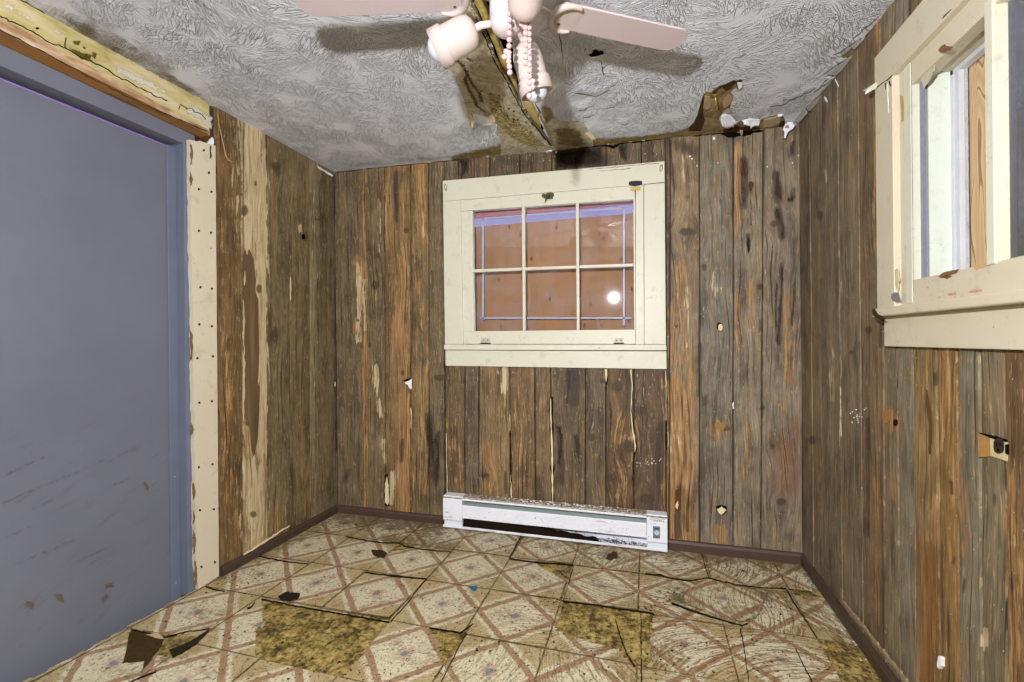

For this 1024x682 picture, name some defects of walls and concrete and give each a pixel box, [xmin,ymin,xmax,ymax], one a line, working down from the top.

peeling [114,66,166,93]
peeling [187,105,214,145]
flaking render [480,90,557,153]
leakage [450,1,683,175]
peeling [683,32,869,137]
peeling [122,629,196,671]
peeling [254,597,389,678]
peeling [552,599,654,666]
peeling [788,569,883,682]